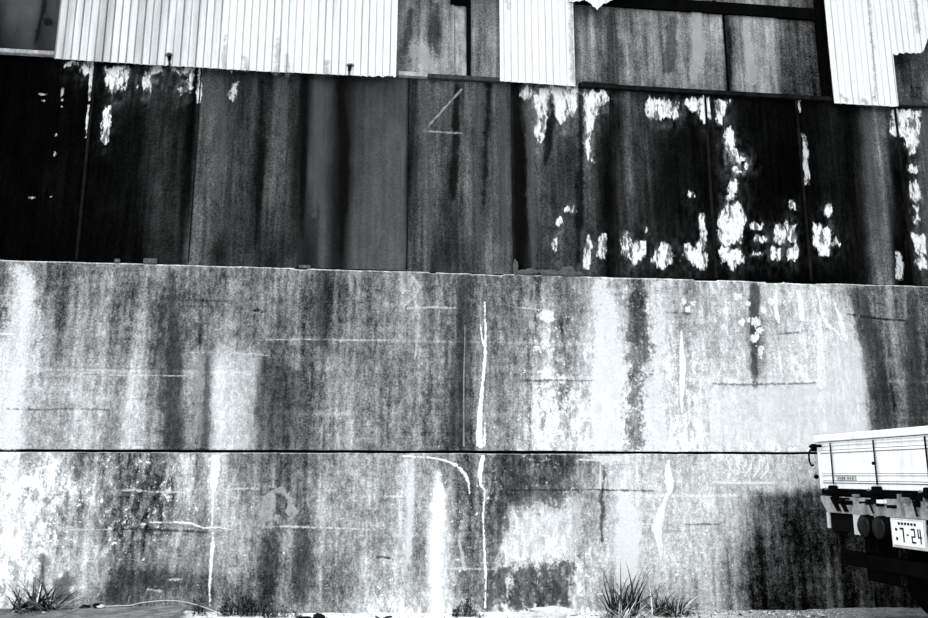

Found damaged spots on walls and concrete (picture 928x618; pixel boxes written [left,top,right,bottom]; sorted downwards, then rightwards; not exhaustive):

peeling [519,84,609,163]
peeling [621,227,673,270]
peeling [645,95,799,271]
peeling [813,204,841,257]
peeling [889,109,927,270]
leakage [0,265,42,450]
leakage [158,272,183,449]
crack [117,455,231,606]
leakage [201,356,210,448]
crack [402,302,487,609]
leakage [586,279,686,590]
leakage [749,284,760,387]